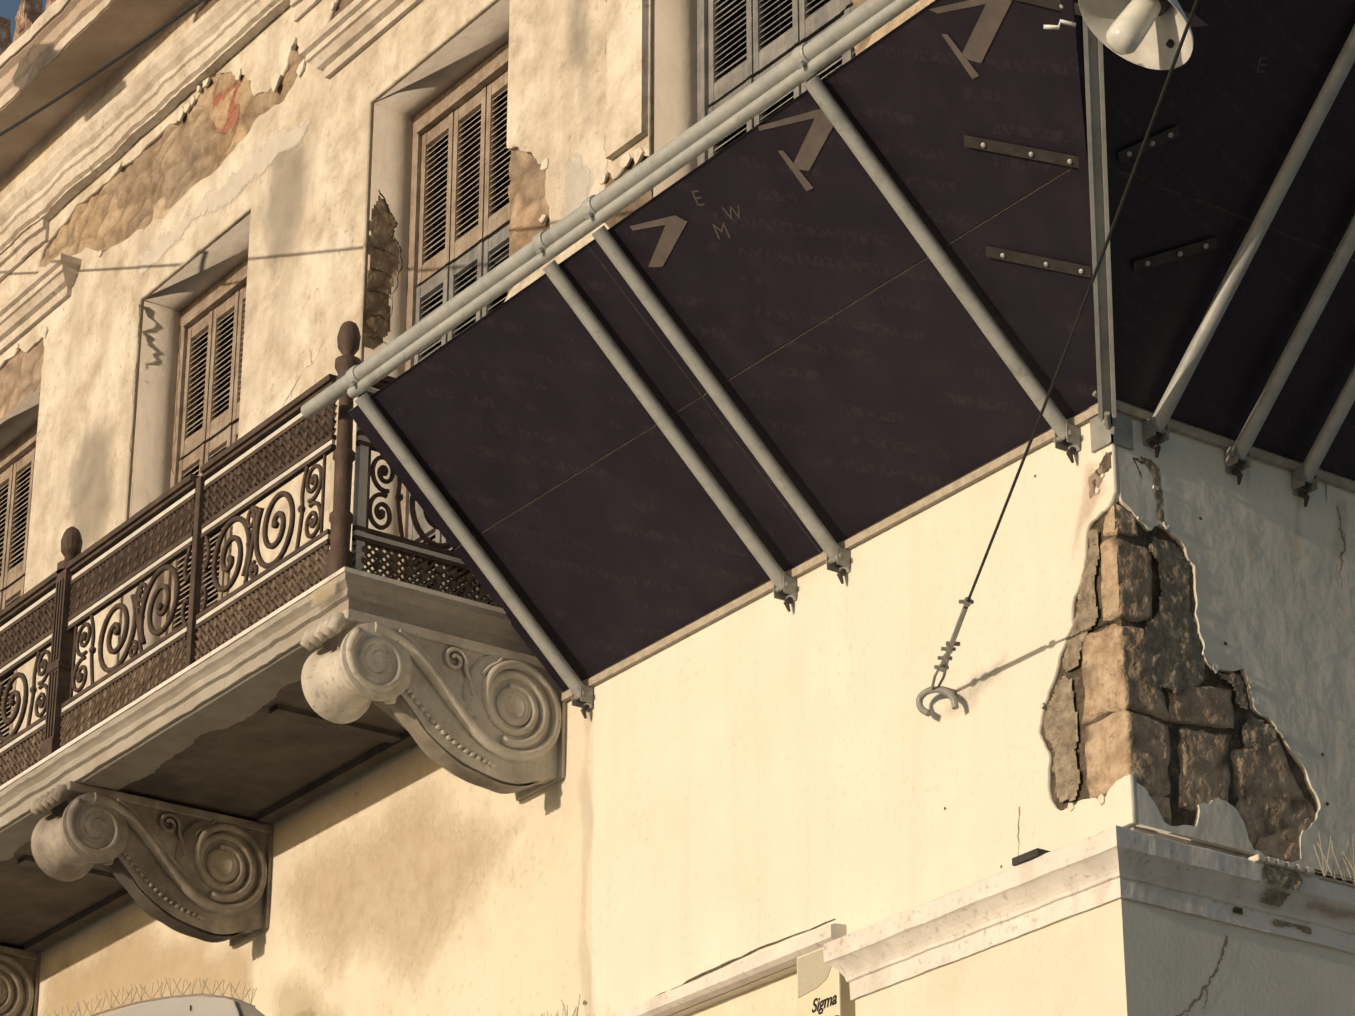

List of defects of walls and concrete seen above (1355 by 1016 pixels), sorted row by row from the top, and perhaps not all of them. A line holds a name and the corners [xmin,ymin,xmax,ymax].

spalling [40,34,315,274]
spalling [508,149,550,257]
spalling [599,147,648,187]
spalling [606,190,652,228]
spalling [362,190,403,350]
spalling [0,326,49,418]
crack [1326,484,1346,589]
spalling [1039,450,1329,934]
crack [1176,935,1228,1016]